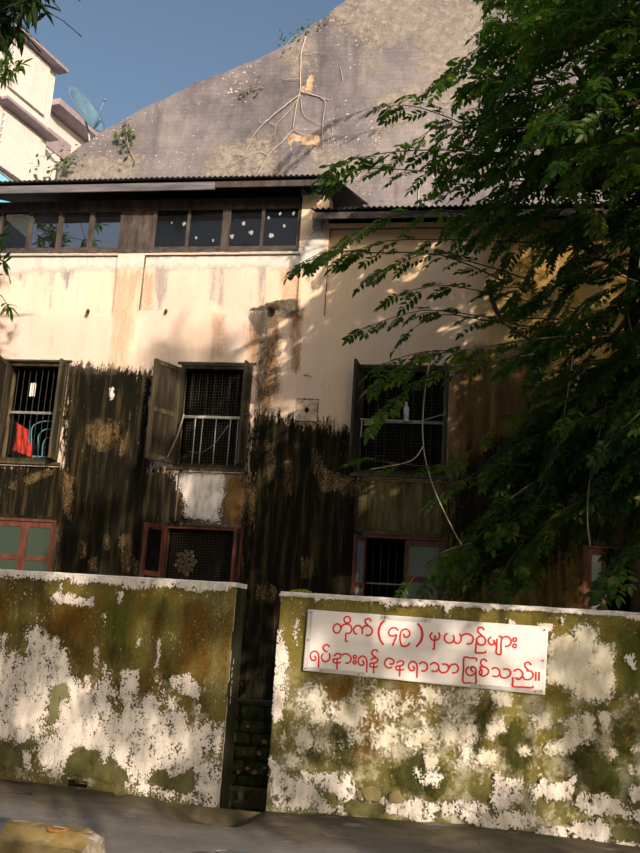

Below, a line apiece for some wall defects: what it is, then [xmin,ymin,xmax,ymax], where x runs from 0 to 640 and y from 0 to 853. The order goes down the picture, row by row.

peeling [284,38,317,97]
peeling [331,0,468,71]
flaking render [287,127,320,147]
water stain [0,361,192,577]
water stain [237,228,630,701]
peeling [0,624,234,808]
water stain [358,713,382,754]
water stain [396,685,423,712]
water stain [389,748,448,800]
peeling [237,593,640,847]
water stain [464,701,495,761]
water stain [567,708,637,797]